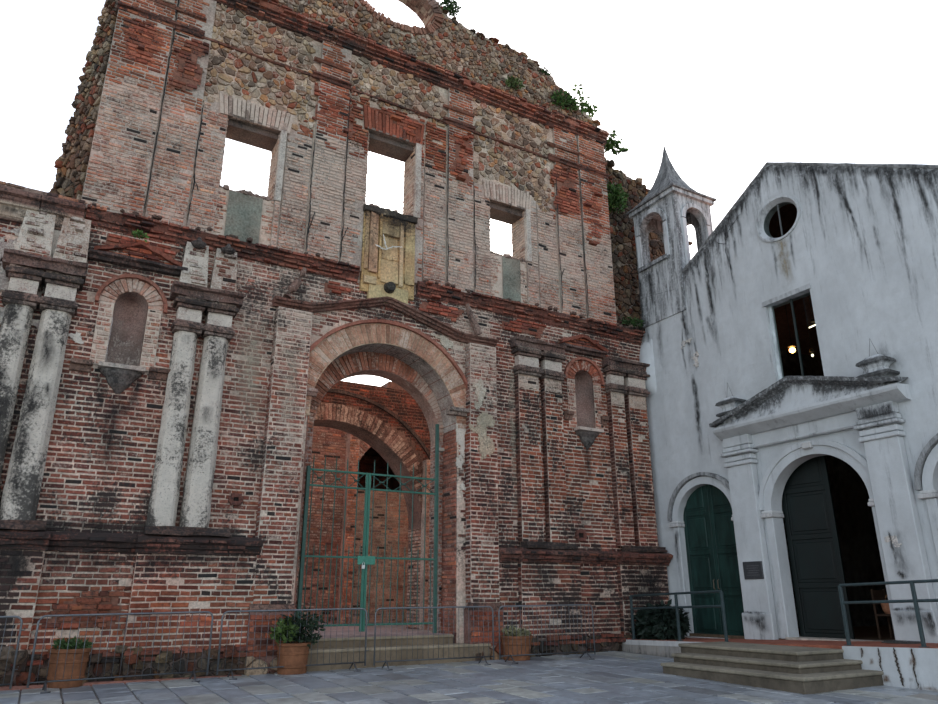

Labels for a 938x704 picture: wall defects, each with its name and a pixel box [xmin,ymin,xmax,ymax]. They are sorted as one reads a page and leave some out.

leakage [803,167,854,223]
leakage [848,169,903,240]
flaking render [0,227,20,291]
leakage [687,194,748,313]
flaking render [68,332,84,344]
flaking render [430,332,454,350]
flaking render [455,373,495,470]
leakage [860,404,892,419]